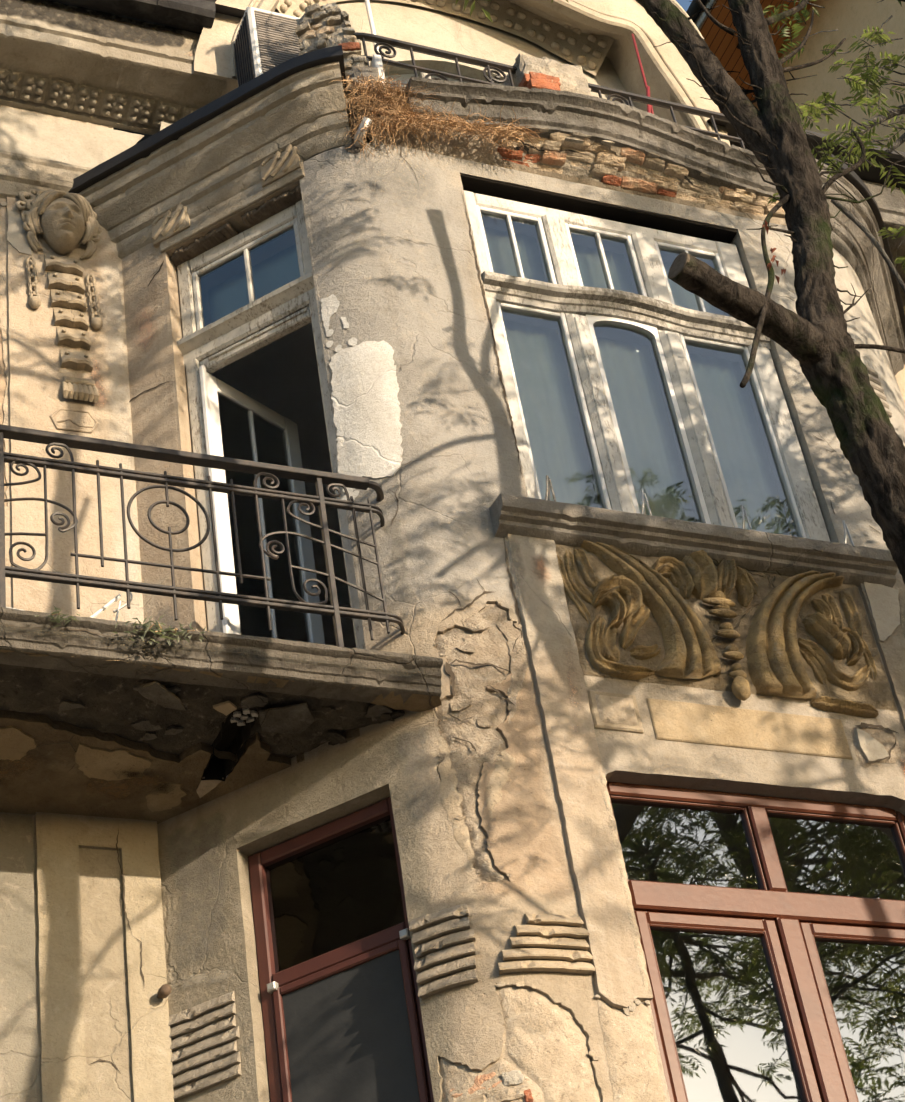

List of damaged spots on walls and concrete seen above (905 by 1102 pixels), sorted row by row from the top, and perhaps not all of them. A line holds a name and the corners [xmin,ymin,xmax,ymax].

flaking render [494,125,785,219]
peeling [146,777,224,812]
spalling [0,664,405,781]
spalling [434,602,528,882]
spalling [852,722,901,768]
crack [116,830,145,983]
spalling [439,773,666,1102]